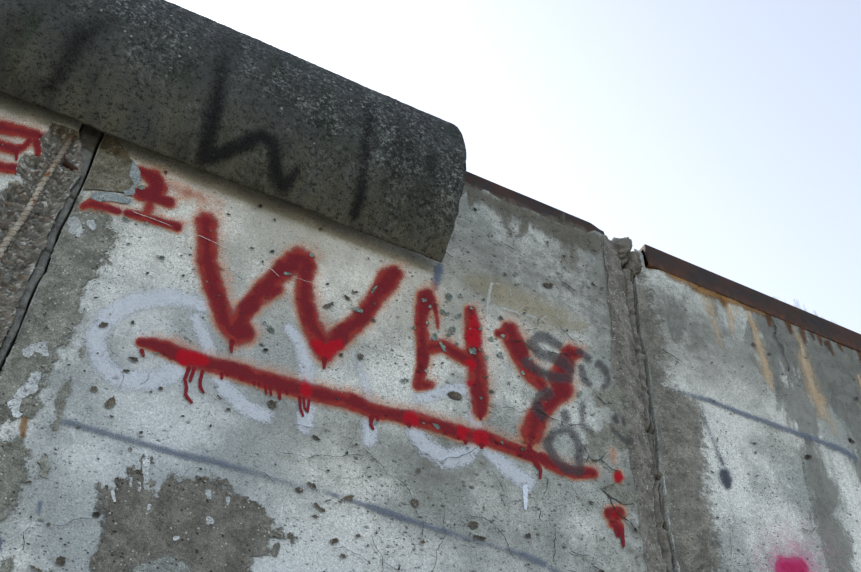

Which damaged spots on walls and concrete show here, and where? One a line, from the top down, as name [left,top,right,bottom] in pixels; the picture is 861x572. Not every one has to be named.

peeling [0,122,145,538]
peeling [578,235,727,572]
corrosion [663,269,773,390]
leakage [745,310,861,572]
corrosion [785,321,843,418]
peeling [0,555,15,572]
peeling [86,447,298,572]